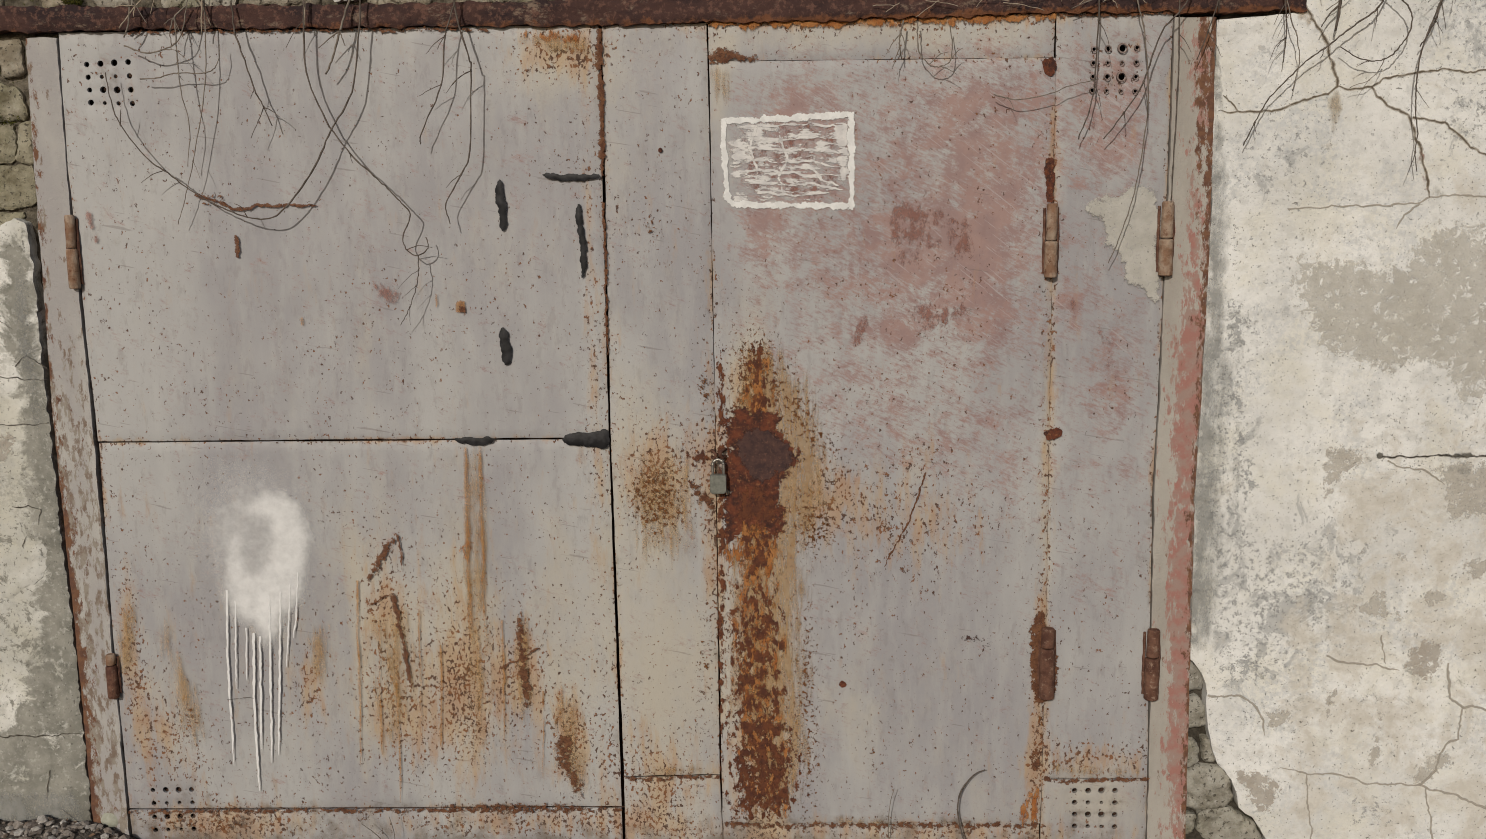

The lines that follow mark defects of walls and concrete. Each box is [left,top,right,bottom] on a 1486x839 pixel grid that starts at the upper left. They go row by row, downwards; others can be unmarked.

flaking render [0,32,59,287]
flaking render [0,0,554,9]
rust [707,46,759,90]
peeling [891,202,970,263]
rust [707,10,1172,31]
crack [1218,7,1486,227]
crack [1382,454,1486,484]
rust [128,451,622,837]
rust [619,328,1150,831]
crack [1327,635,1397,670]
flaking render [1185,660,1281,839]
crack [1278,663,1486,839]